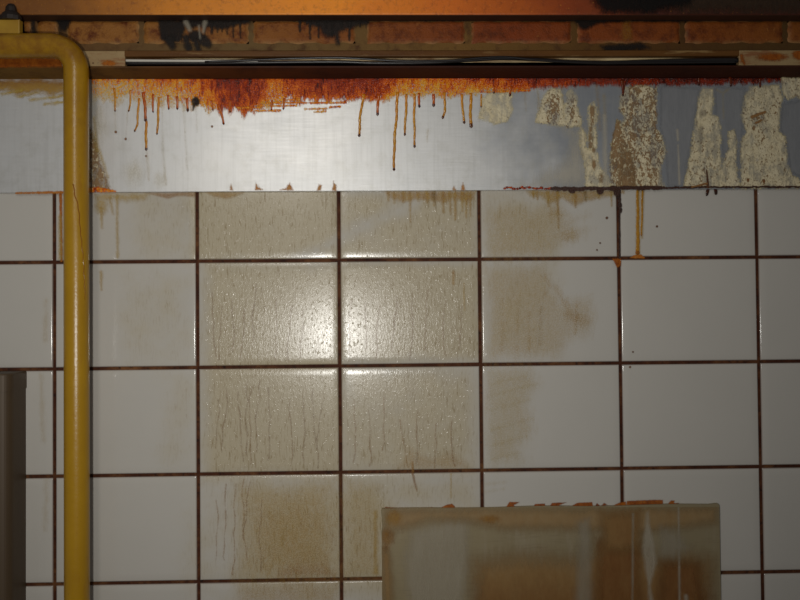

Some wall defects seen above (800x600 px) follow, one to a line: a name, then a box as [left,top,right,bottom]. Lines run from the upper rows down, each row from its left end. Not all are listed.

rust [89,129,116,193]
rust [91,77,782,171]
peeling [535,85,665,187]
peeling [684,77,800,189]
rust [503,170,800,267]